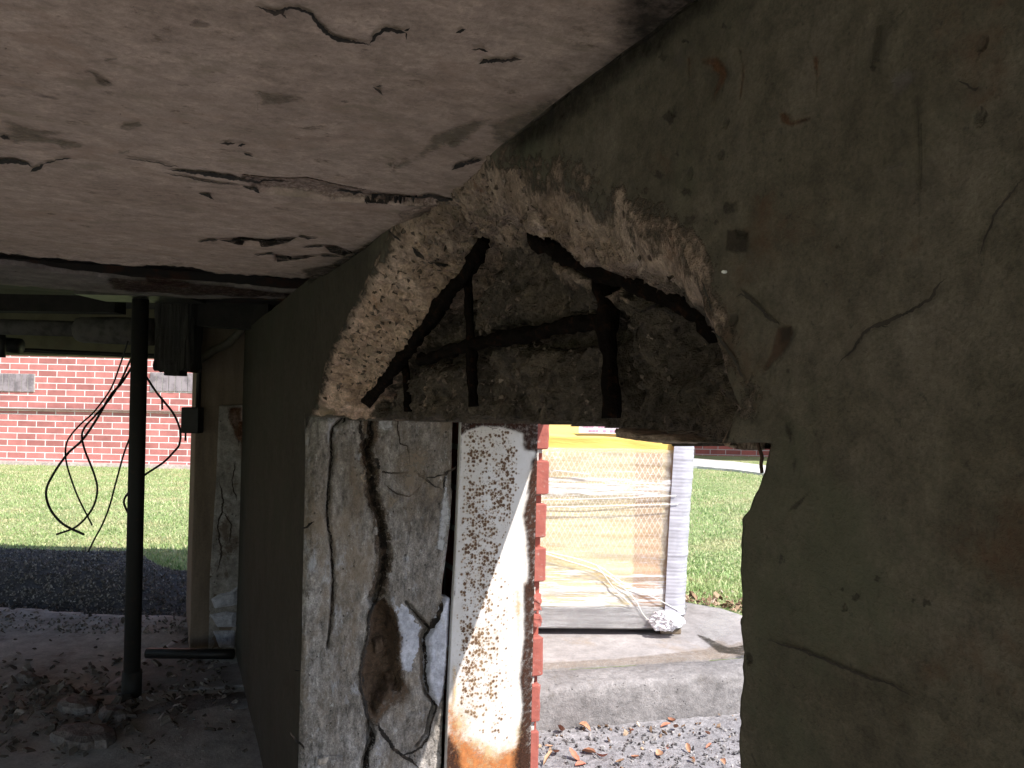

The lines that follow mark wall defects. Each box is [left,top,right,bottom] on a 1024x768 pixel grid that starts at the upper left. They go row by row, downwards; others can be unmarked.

crack [256,6,410,46]
crack [0,135,72,172]
crack [126,142,453,207]
spalling [311,155,771,450]
crack [302,418,457,643]
spalling [358,597,421,730]
crack [363,602,443,768]
corrosion [447,422,538,768]